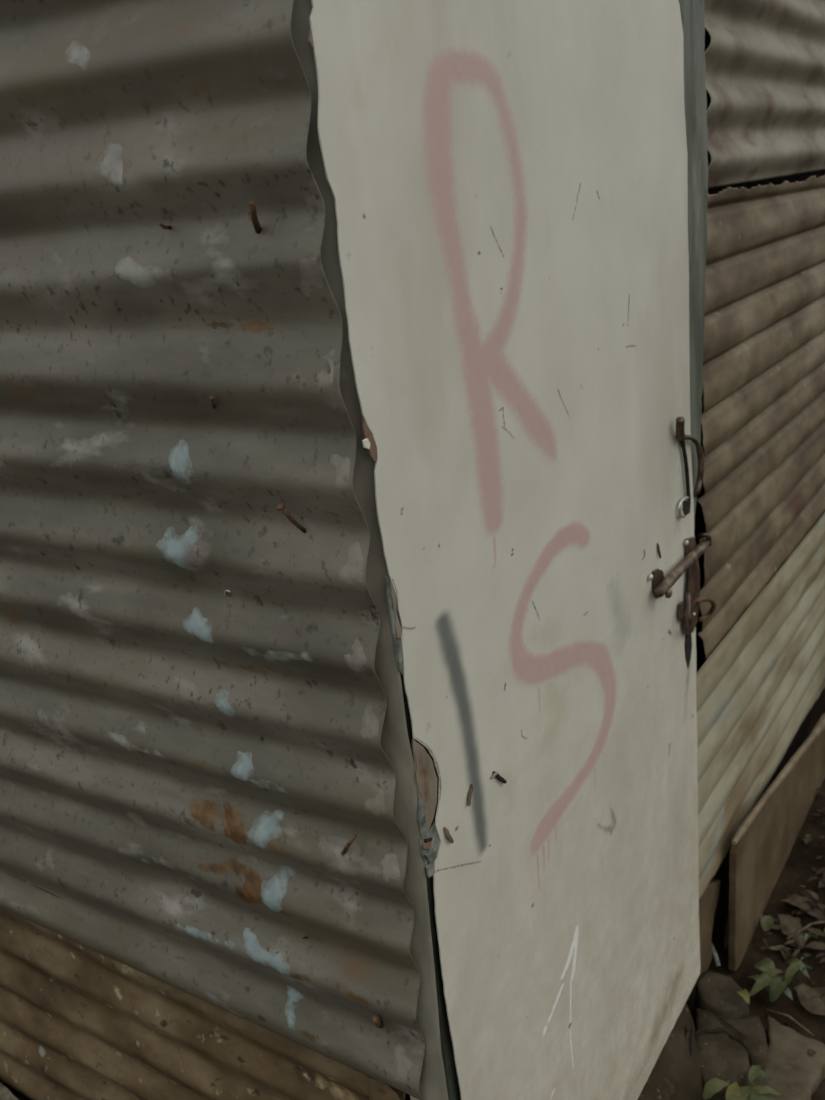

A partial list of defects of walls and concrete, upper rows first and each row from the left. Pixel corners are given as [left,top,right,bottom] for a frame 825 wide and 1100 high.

corrosion [191,800,248,846]
peeling [412,735,442,878]
corrosion [198,857,263,905]